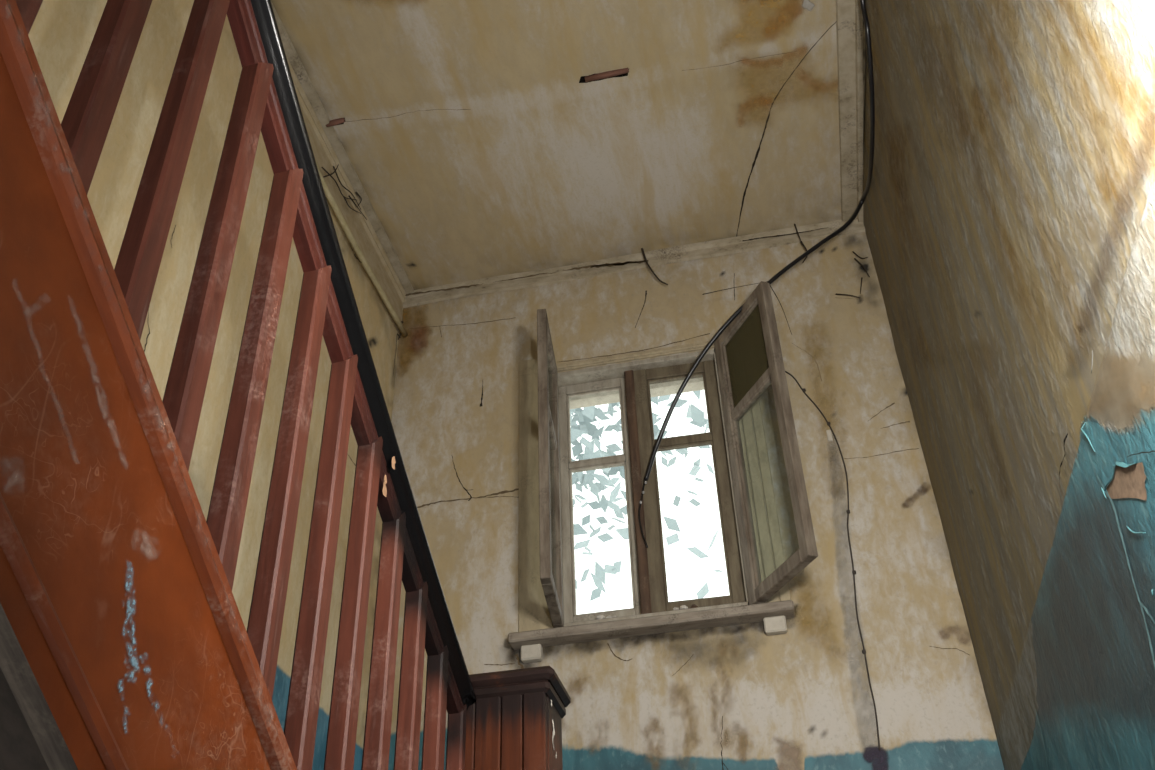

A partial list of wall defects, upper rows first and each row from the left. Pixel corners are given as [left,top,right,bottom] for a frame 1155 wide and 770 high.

crack [682,21,837,241]
crack [844,403,919,459]
crack [417,456,519,508]
peeling [1101,462,1147,500]